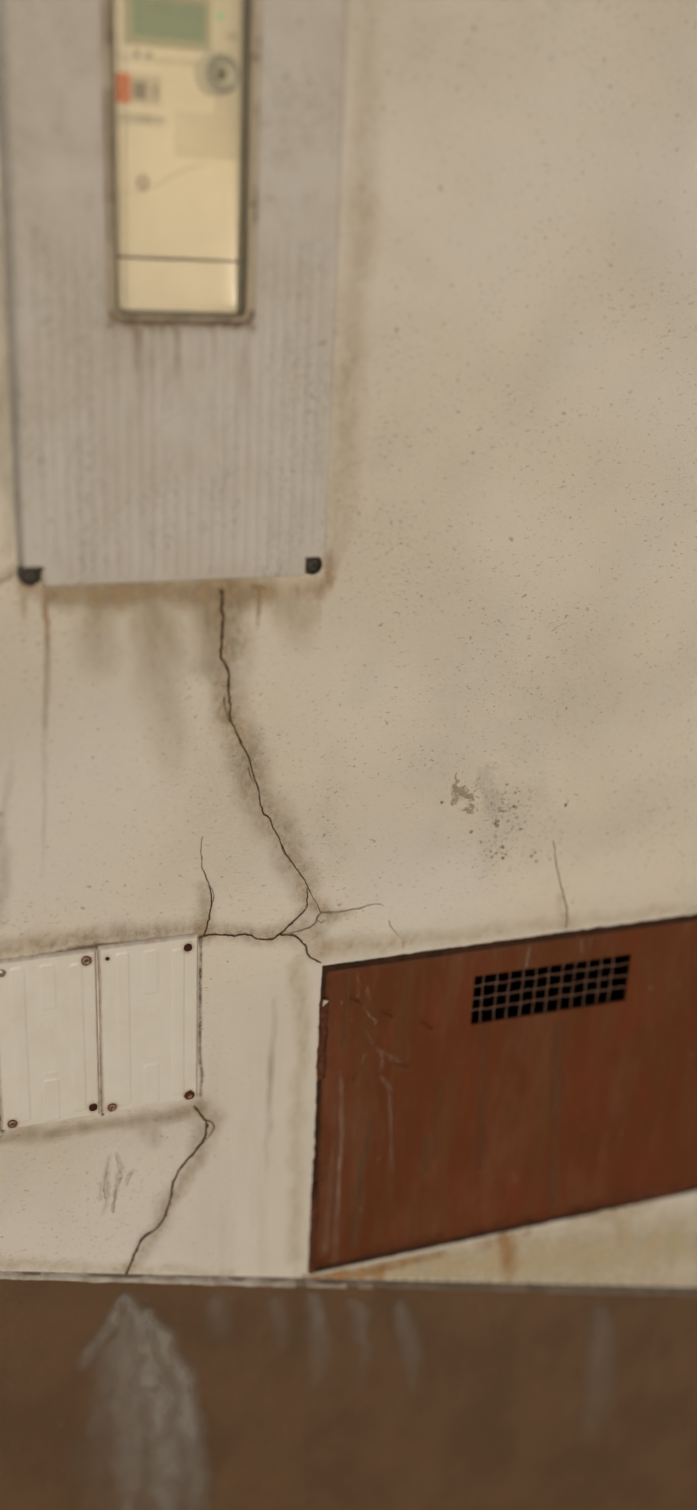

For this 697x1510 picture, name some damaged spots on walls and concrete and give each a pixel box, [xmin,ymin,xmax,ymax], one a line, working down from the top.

crack [198,584,404,964]
crack [125,1106,215,1275]
water stain [109,1297,195,1475]